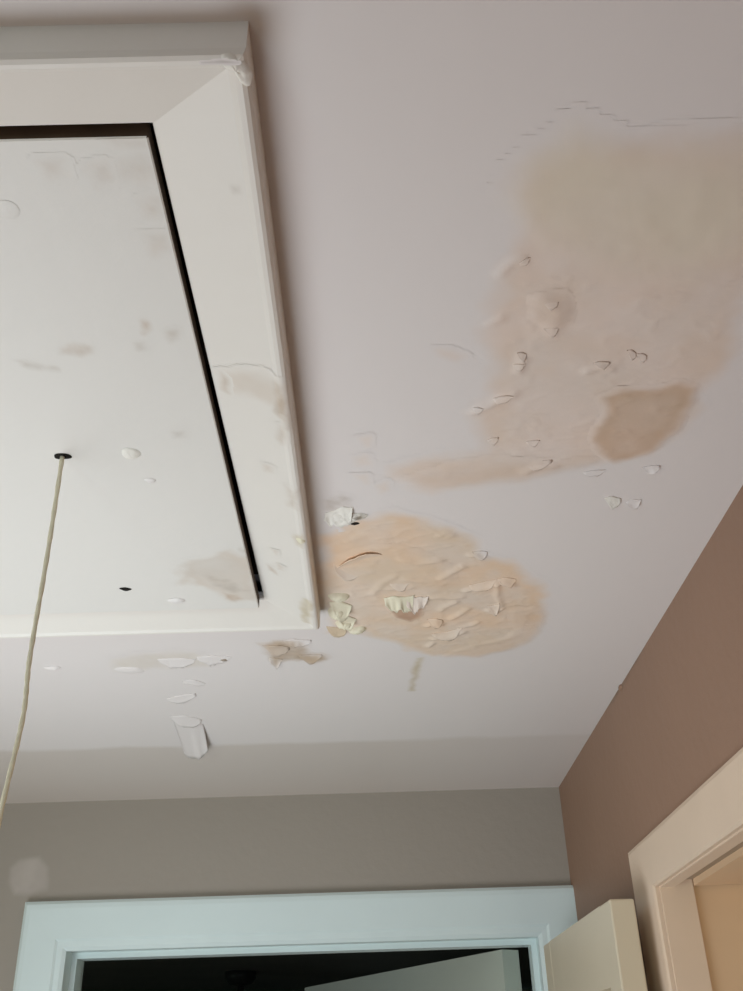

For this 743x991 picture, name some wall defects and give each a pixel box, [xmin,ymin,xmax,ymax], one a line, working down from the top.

water stain [380,102,743,499]
water stain [289,506,556,692]
peeling [167,693,208,760]